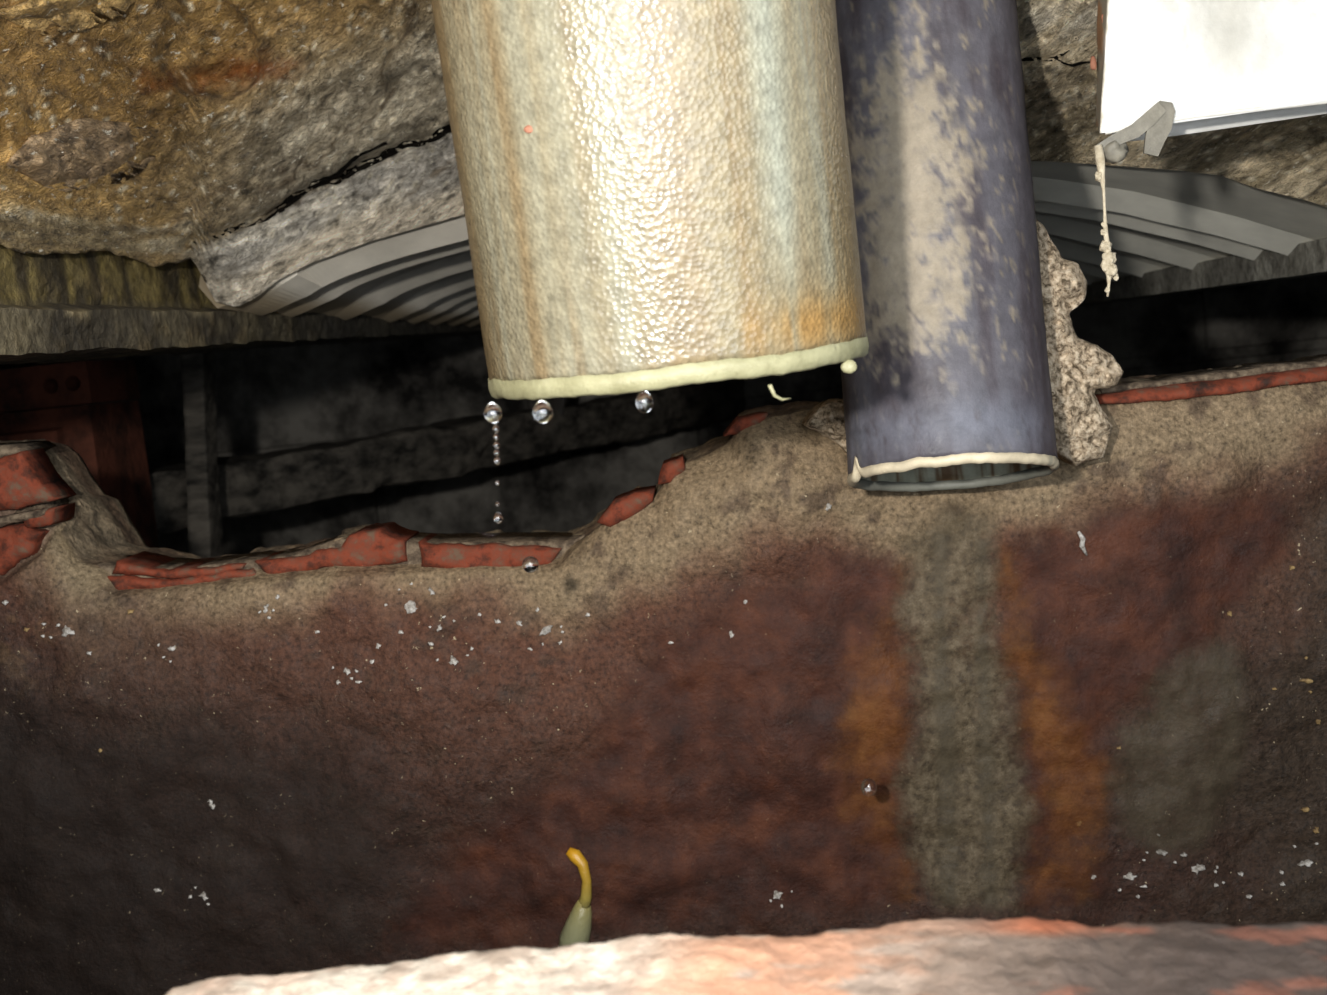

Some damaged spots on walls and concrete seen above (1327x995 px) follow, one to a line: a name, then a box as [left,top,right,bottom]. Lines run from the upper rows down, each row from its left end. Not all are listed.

spalling [723,412,768,437]
spalling [0,440,76,575]
spalling [597,454,685,527]
spalling [96,522,586,590]
water stain [41,623,75,639]
water stain [332,643,381,685]
water stain [398,582,417,614]
water stain [428,615,474,665]
water stain [901,516,1030,905]
rust [405,557,905,947]
water stain [558,847,592,947]
water stain [1118,834,1225,899]